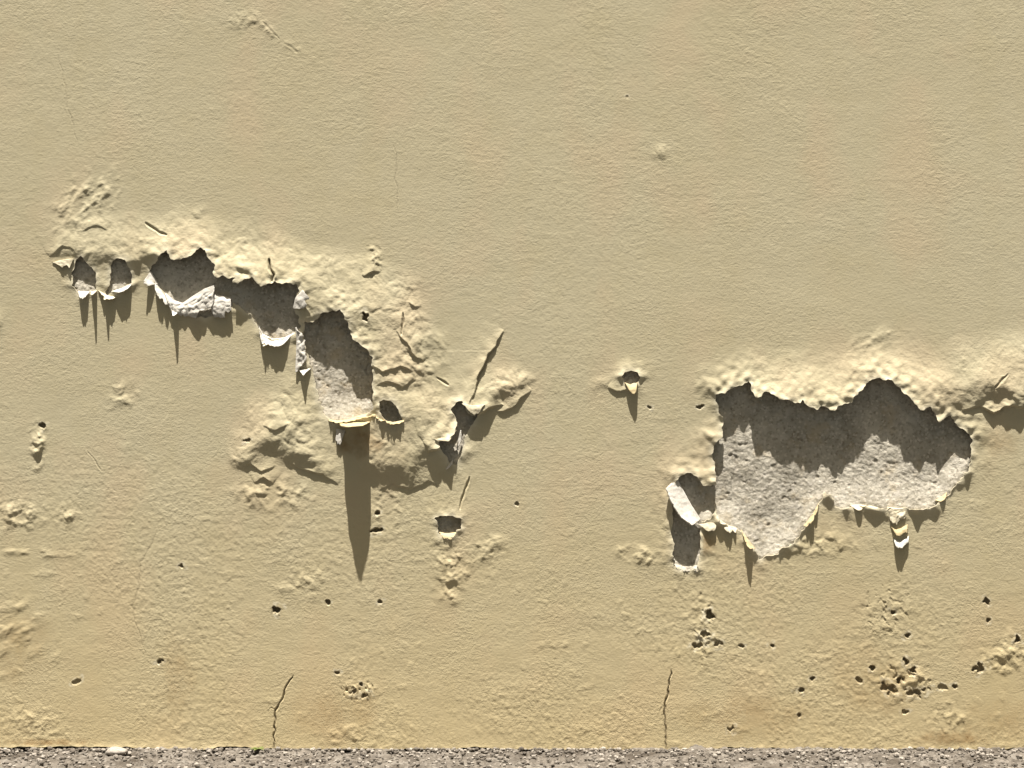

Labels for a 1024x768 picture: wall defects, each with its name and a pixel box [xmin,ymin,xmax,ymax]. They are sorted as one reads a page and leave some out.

peeling [52,243,409,445]
crack [435,328,511,406]
peeling [616,365,644,394]
peeling [431,396,485,473]
peeling [665,371,979,578]
peeling [431,510,469,542]
crack [266,674,297,748]
crack [657,669,676,750]